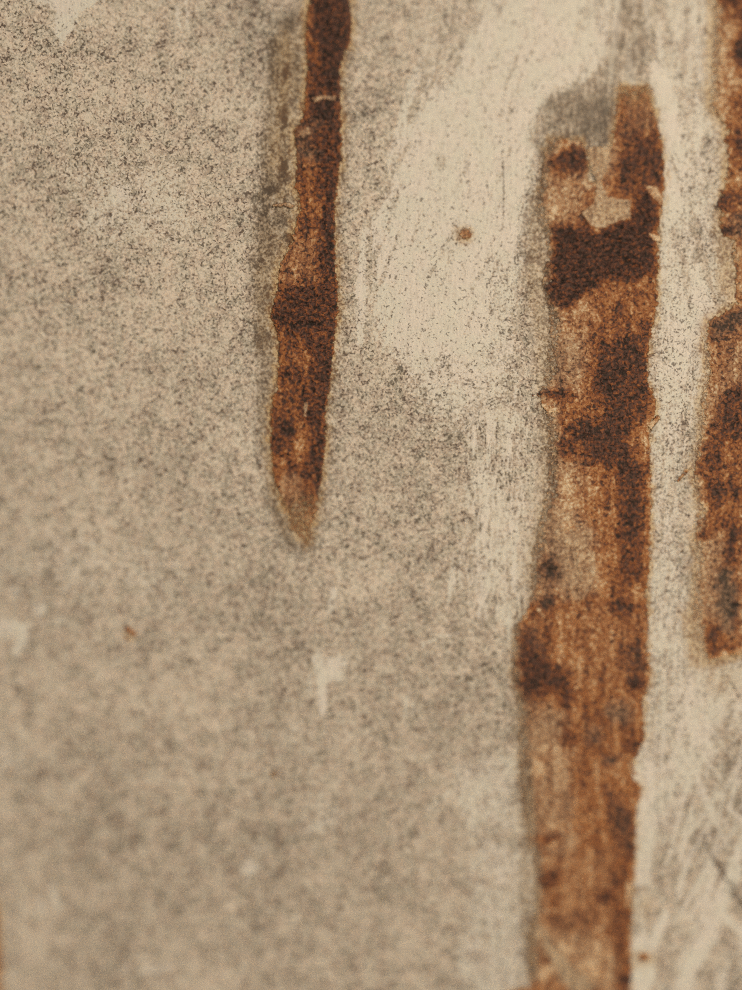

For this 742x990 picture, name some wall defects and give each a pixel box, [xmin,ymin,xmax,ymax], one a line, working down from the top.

rust [236,0,373,564]
rust [503,77,676,990]
rust [673,0,742,679]